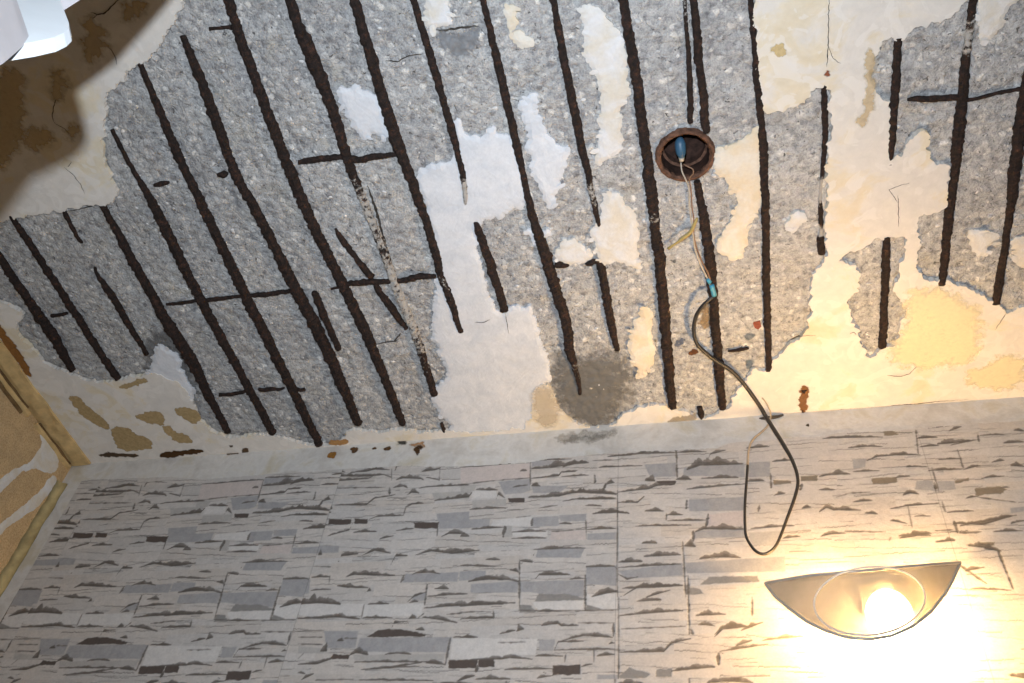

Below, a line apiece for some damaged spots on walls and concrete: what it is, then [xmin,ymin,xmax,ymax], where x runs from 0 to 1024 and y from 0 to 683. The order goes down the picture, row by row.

crack [827,3,839,63]
spalling [857,0,1024,310]
spalling [0,0,832,452]
corrosion [698,307,710,329]
spalling [842,237,907,356]
corrosion [0,325,31,377]
leakage [551,353,636,426]
corrosion [798,385,809,413]
corrosion [160,449,204,458]
corrosion [327,439,358,458]